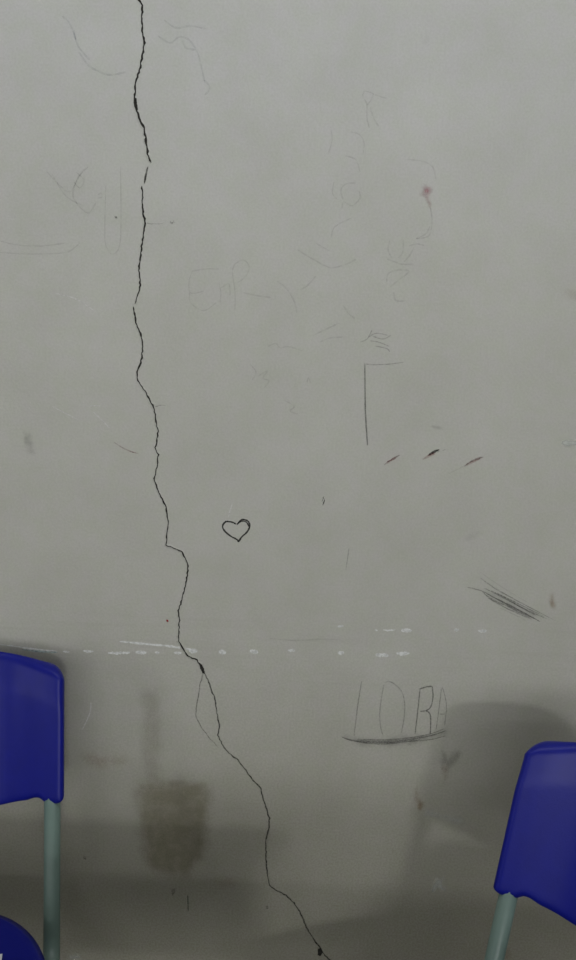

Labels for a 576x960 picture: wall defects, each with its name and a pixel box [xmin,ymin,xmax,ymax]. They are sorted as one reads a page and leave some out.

crack [131,0,330,960]